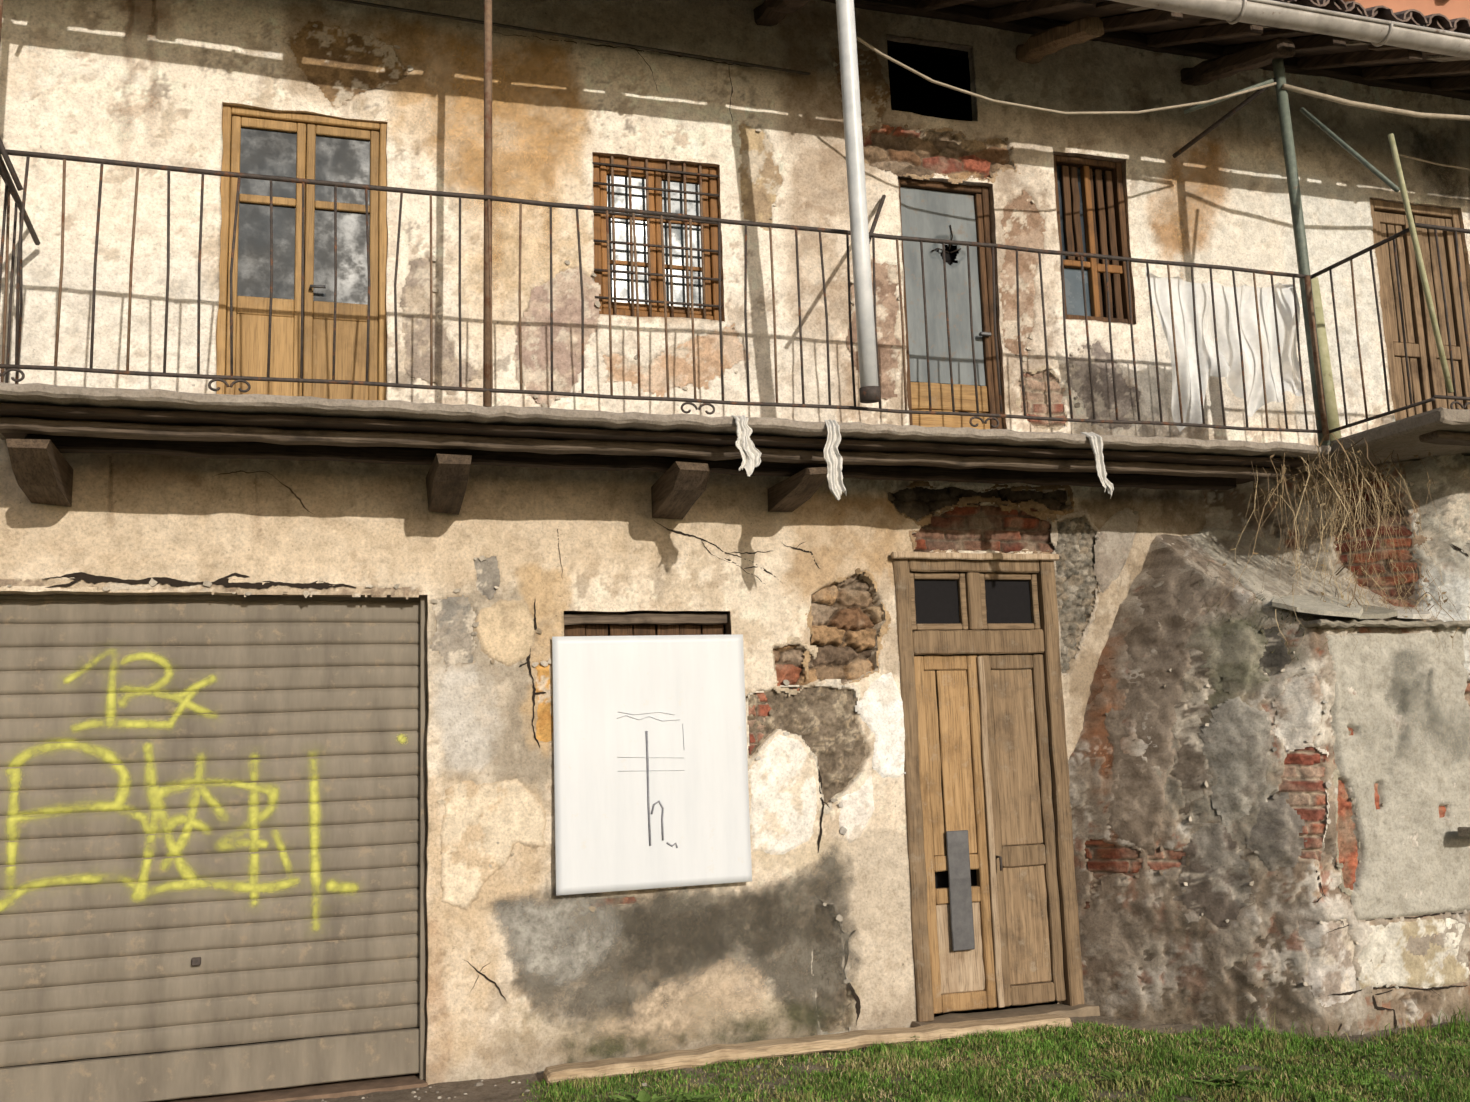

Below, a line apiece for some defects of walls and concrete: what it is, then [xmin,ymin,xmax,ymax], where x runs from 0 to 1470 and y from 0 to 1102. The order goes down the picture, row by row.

peeling [284,21,414,107]
spalling [831,47,1141,431]
crack [45,572,356,590]
crack [656,522,820,584]
spalling [888,481,1101,676]
spalling [746,568,891,814]
peeling [1083,649,1255,928]
spalling [1258,626,1360,896]
spalling [1374,783,1383,809]
leakage [495,849,859,1044]
peeling [1298,919,1358,1007]